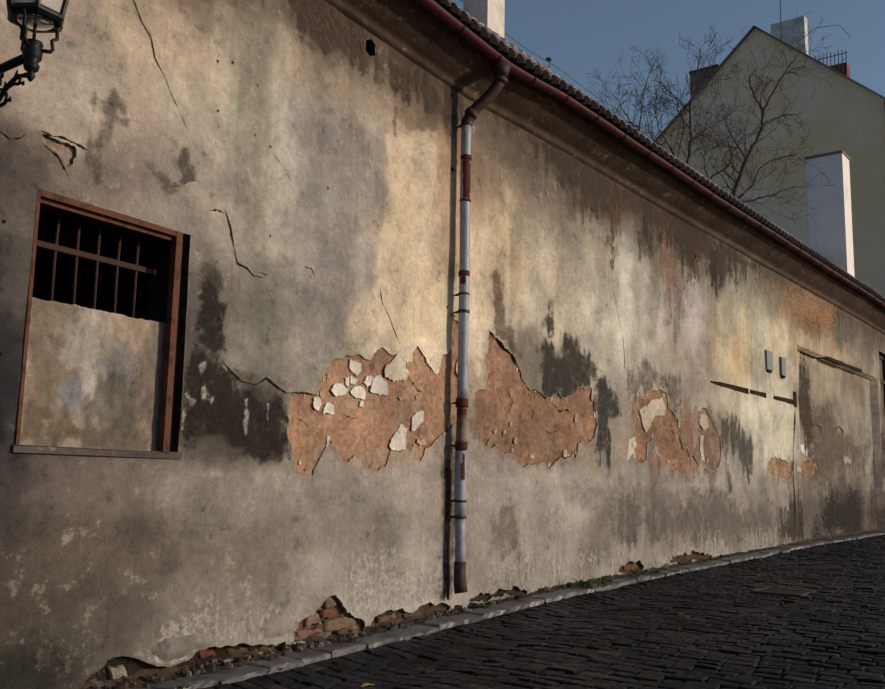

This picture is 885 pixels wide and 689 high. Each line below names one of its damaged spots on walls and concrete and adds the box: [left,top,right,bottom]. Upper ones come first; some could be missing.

crack [134,0,187,131]
crack [209,206,268,278]
peeling [181,386,214,430]
peeling [282,305,599,483]
peeling [627,382,724,479]
peeling [765,444,822,487]
spalling [614,543,719,575]
spalling [68,579,533,689]